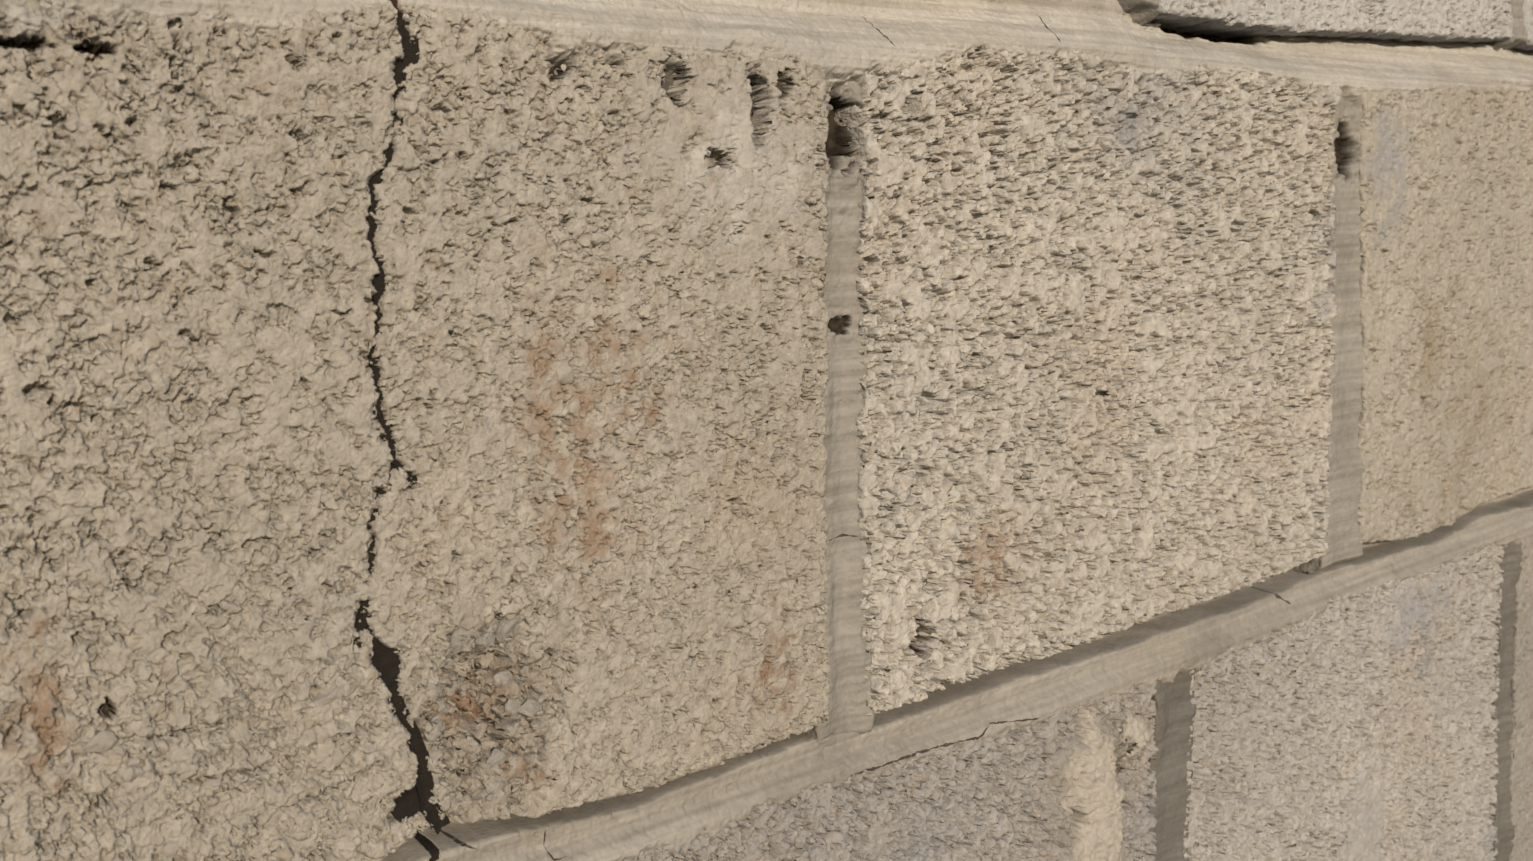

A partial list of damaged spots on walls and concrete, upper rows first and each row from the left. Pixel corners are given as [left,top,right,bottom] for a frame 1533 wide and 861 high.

crack [353,0,477,861]
crack [543,829,568,861]